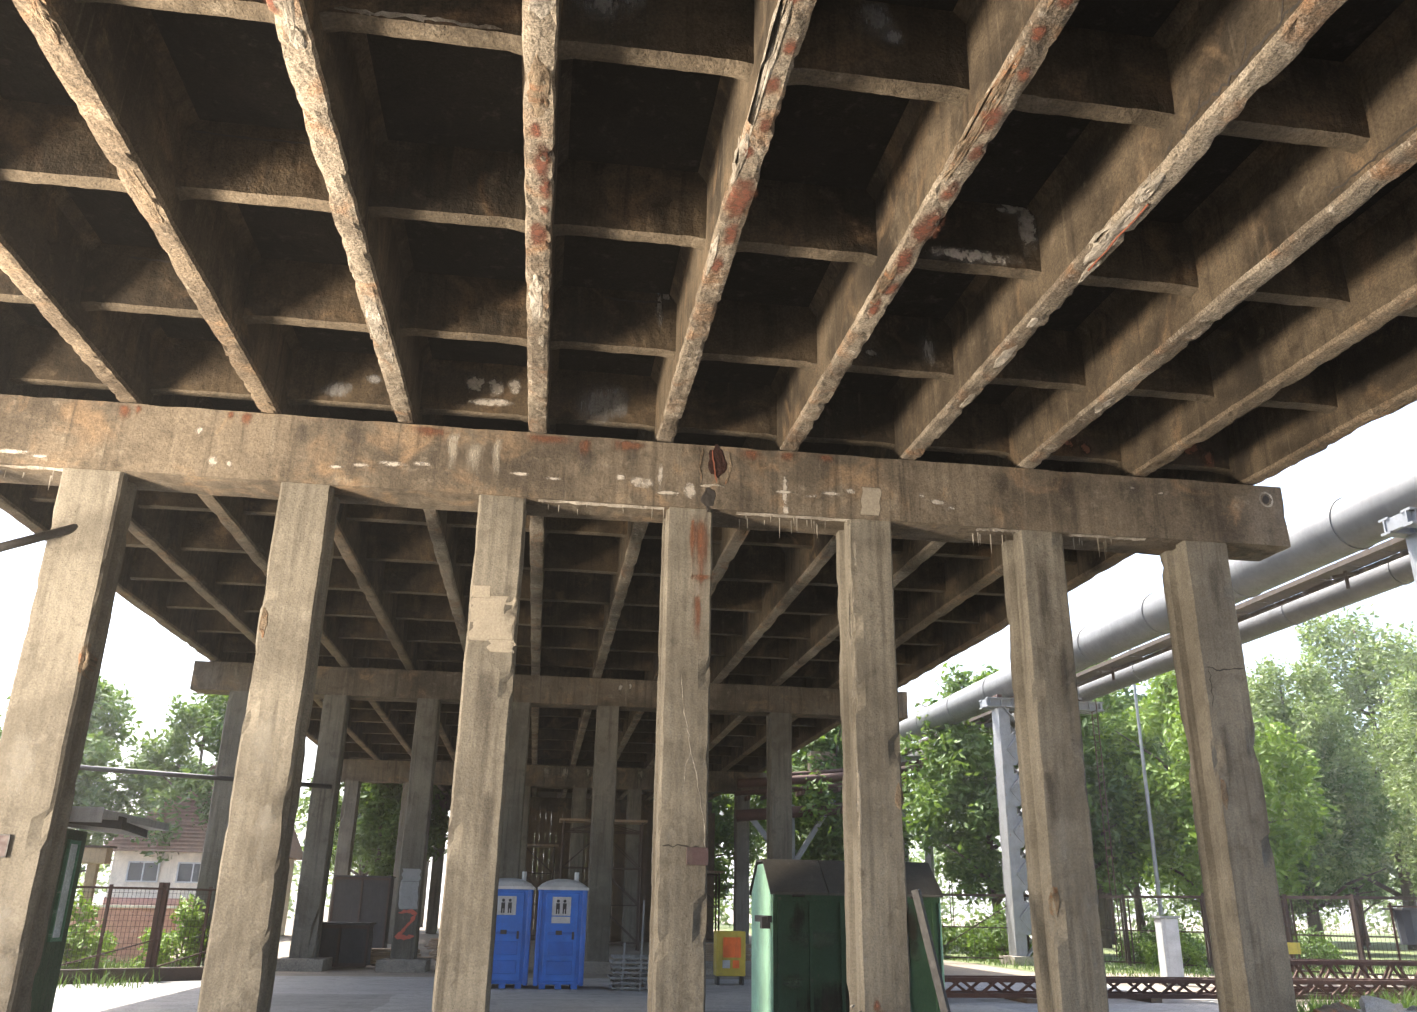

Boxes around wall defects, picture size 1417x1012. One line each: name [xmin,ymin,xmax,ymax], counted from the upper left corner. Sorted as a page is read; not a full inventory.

rust [766,77,780,92]
rust [530,123,551,246]
rust [711,180,754,273]
rust [869,182,958,315]
water stain [932,247,1006,263]
water stain [996,204,1036,255]
spalling [657,444,732,512]
peeling [471,585,491,598]
peeling [486,639,516,653]